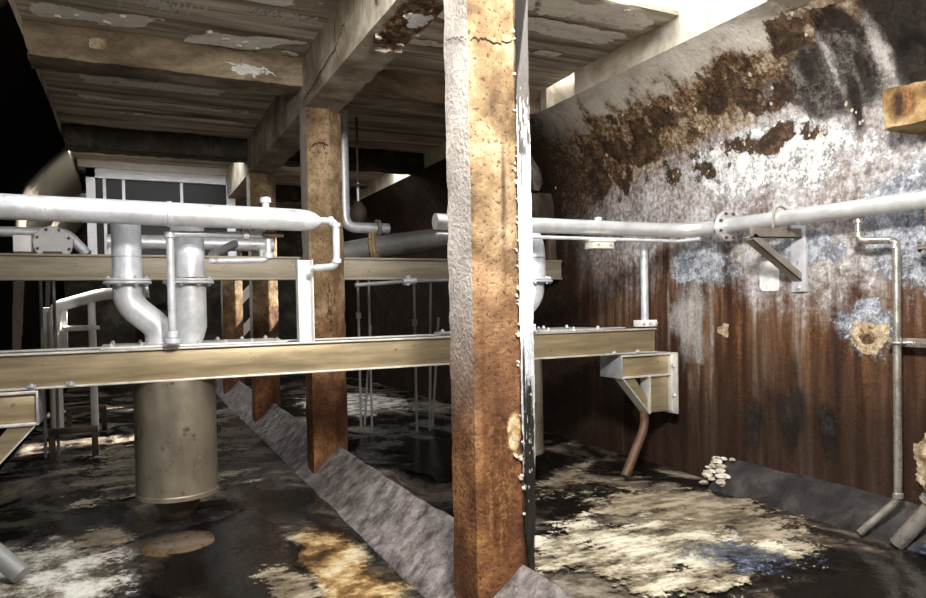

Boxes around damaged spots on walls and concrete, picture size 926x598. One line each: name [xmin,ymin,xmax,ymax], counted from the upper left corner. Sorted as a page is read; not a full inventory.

peeling [29,2,166,28]
spalling [89,37,106,49]
peeling [184,30,308,57]
spalling [372,0,445,53]
crack [446,36,512,44]
spalling [789,0,842,16]
damp [748,0,926,130]
peeling [670,245,742,360]
spalling [837,296,893,356]
spalling [507,413,521,458]
spalling [913,433,926,489]